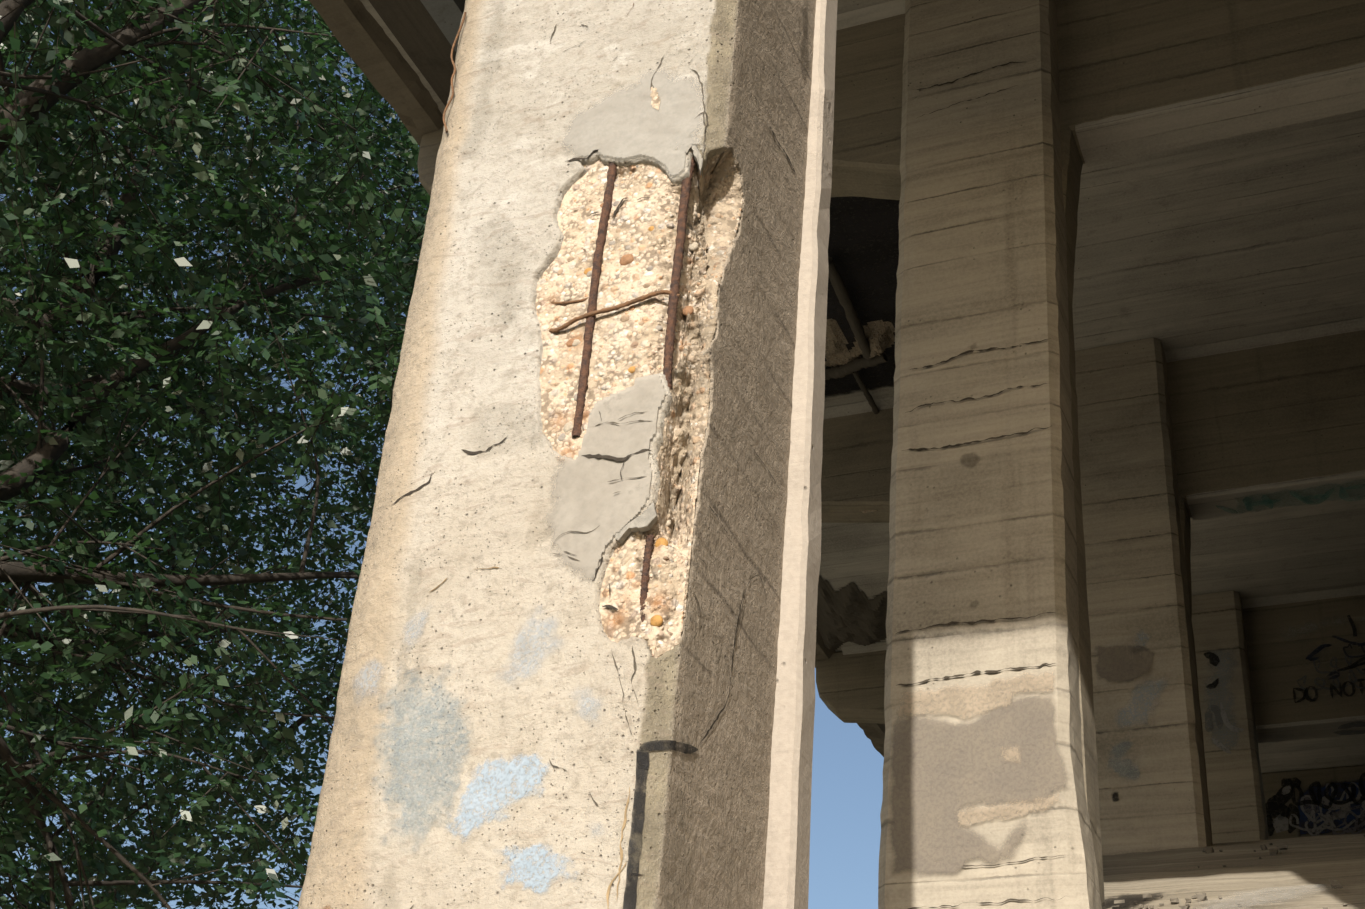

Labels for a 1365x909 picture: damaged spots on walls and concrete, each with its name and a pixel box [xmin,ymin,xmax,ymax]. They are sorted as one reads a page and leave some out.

crack [916,62,1021,118]
spalling [535,71,744,658]
spalling [825,257,895,414]
crack [910,338,1051,370]
crack [905,383,1047,413]
crack [902,426,1051,451]
spalling [816,575,887,651]
crack [896,612,1055,634]
crack [699,575,767,745]
crack [898,663,1055,686]
damp [891,697,1066,873]